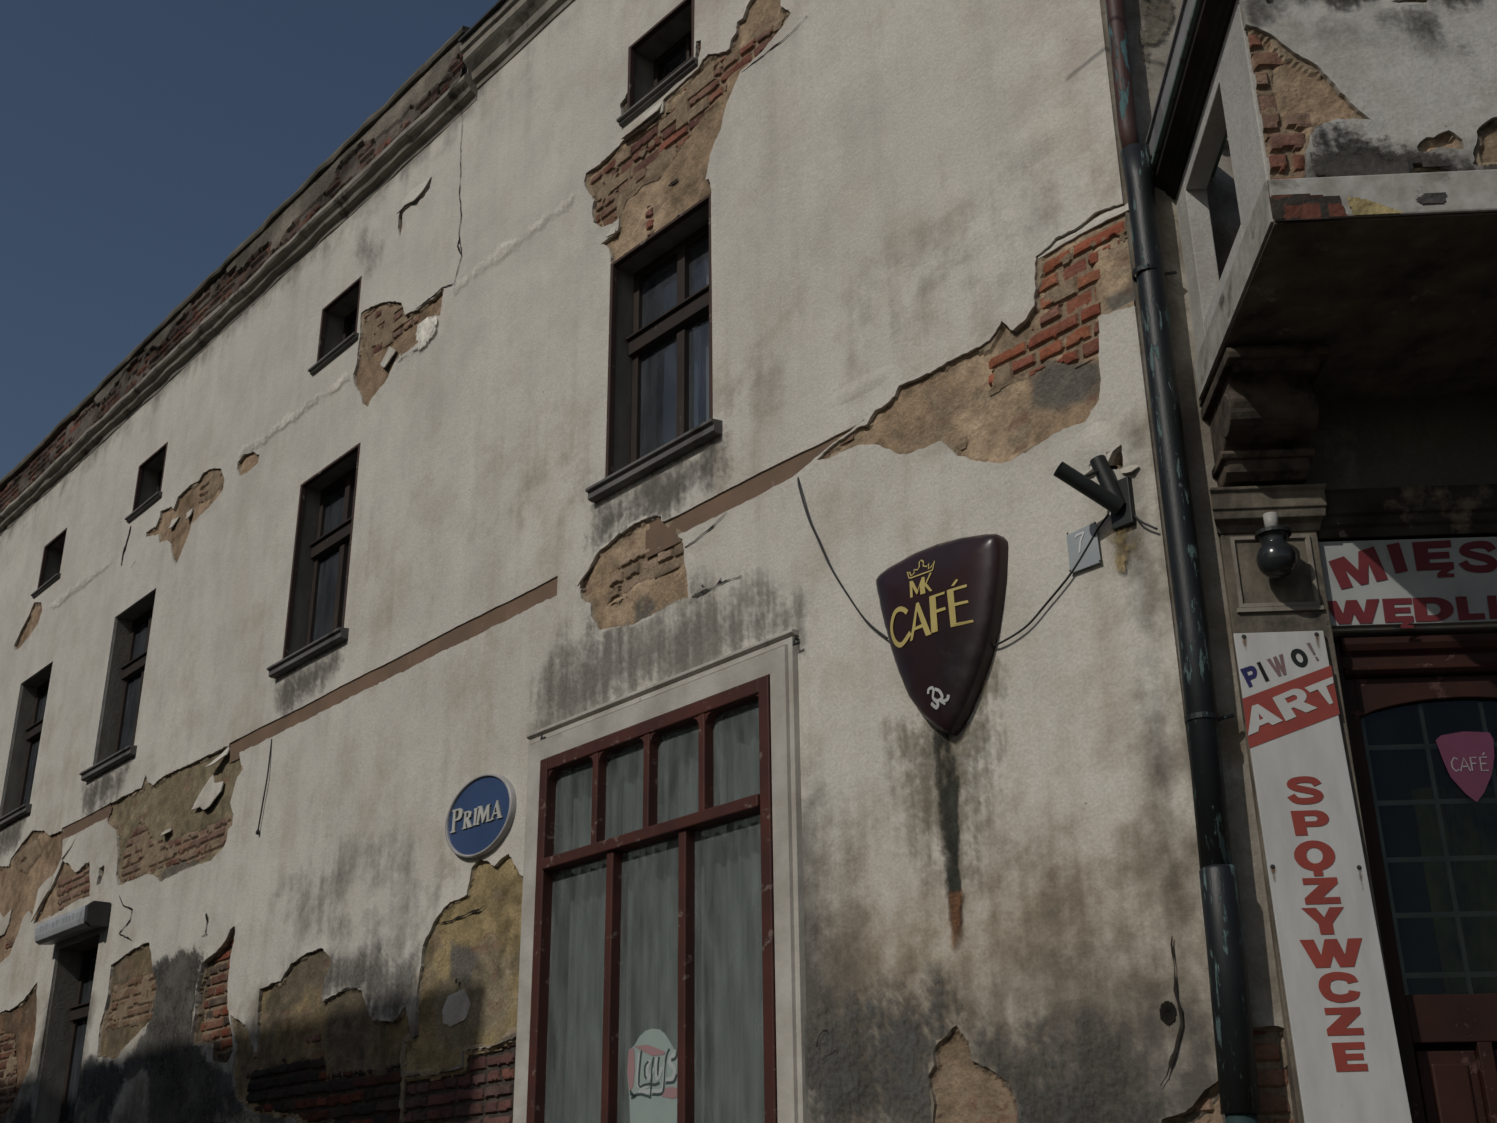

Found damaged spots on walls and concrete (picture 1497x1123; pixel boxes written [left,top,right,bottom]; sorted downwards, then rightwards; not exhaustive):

crack [416,113,462,309]
flaking render [586,0,791,261]
flaking render [1247,28,1447,220]
flaking render [356,292,443,406]
flaking render [826,203,1135,463]
flaking render [147,452,259,562]
flaking render [577,516,688,630]
flaking render [0,746,243,962]
damp [899,675,997,947]
damp [79,948,248,1123]
flaking render [194,856,523,1123]
damp [321,940,416,1021]